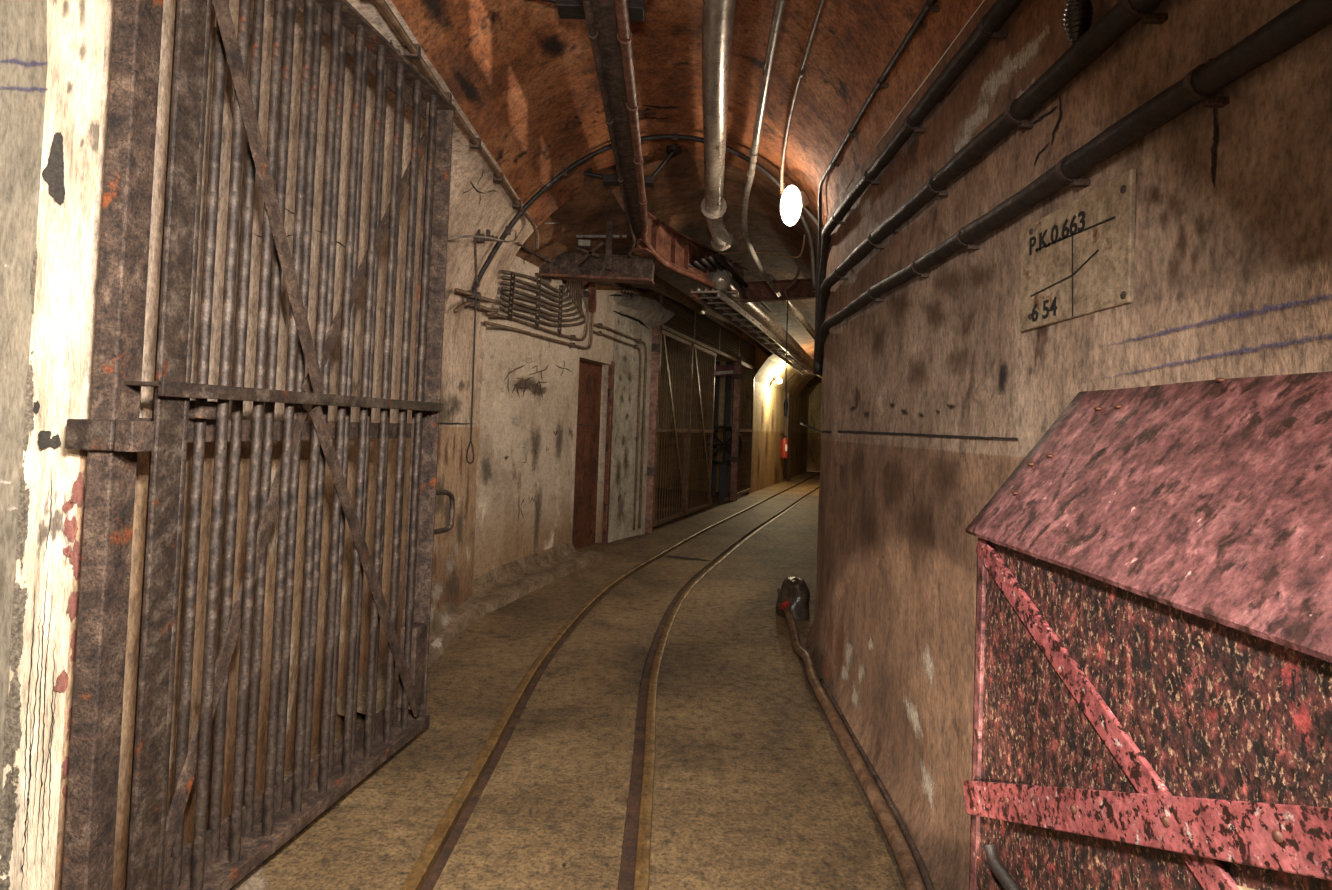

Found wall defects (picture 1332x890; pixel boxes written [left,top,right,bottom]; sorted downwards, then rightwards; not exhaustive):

flaking render [0,351,61,890]
peeling [54,472,85,692]
peeling [61,756,69,819]